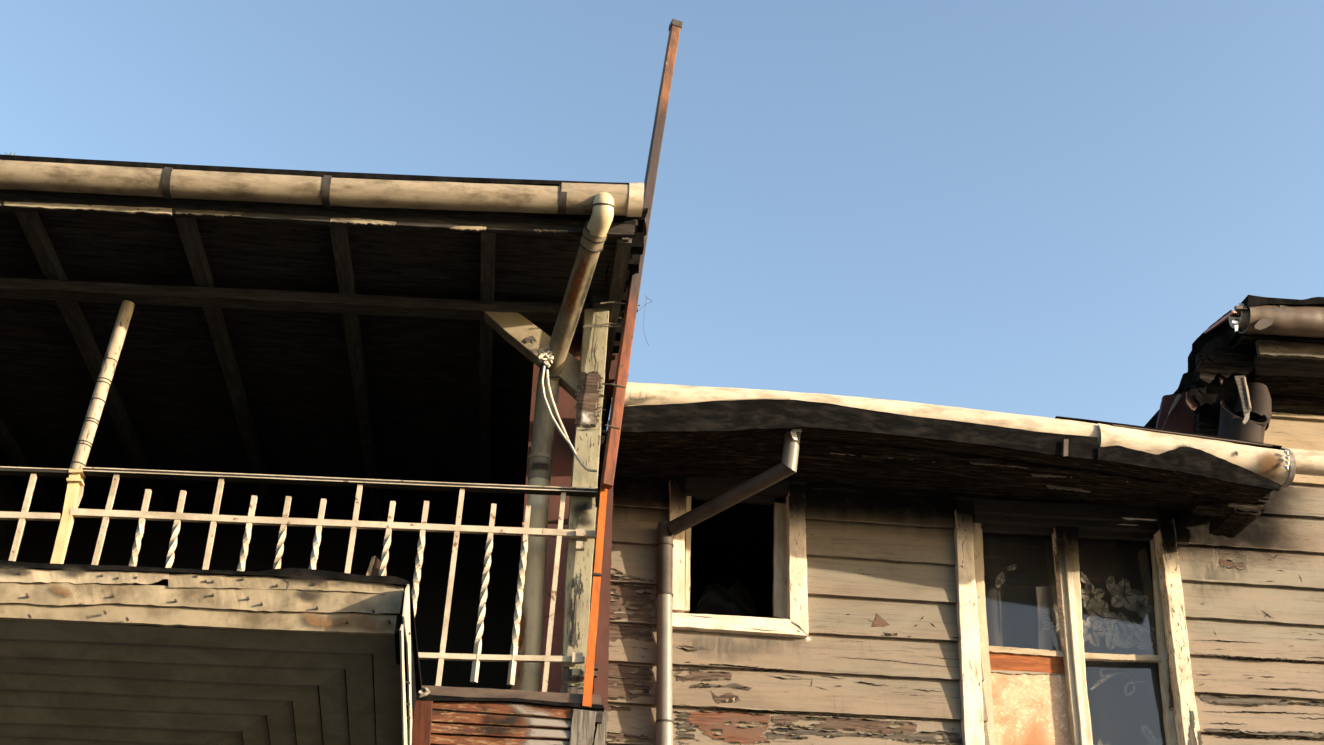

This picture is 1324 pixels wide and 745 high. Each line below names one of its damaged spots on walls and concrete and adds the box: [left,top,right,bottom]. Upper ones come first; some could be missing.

corrosion [566,259,586,308]
peeling [574,370,604,428]
peeling [568,572,592,648]
peeling [609,571,656,642]
peeling [606,732,652,742]
peeling [607,664,653,711]
peeling [672,668,962,745]
peeling [1189,692,1324,745]